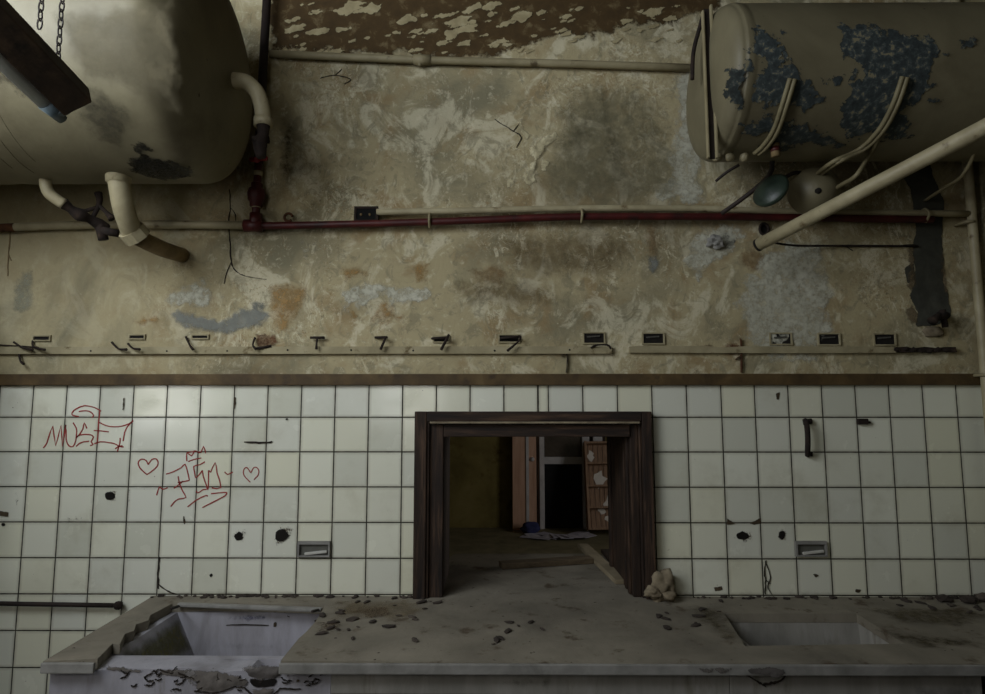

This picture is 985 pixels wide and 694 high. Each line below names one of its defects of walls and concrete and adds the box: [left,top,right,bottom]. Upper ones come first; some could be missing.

peeling [270,0,720,57]
peeling [173,286,304,333]
spalling [162,665,299,694]